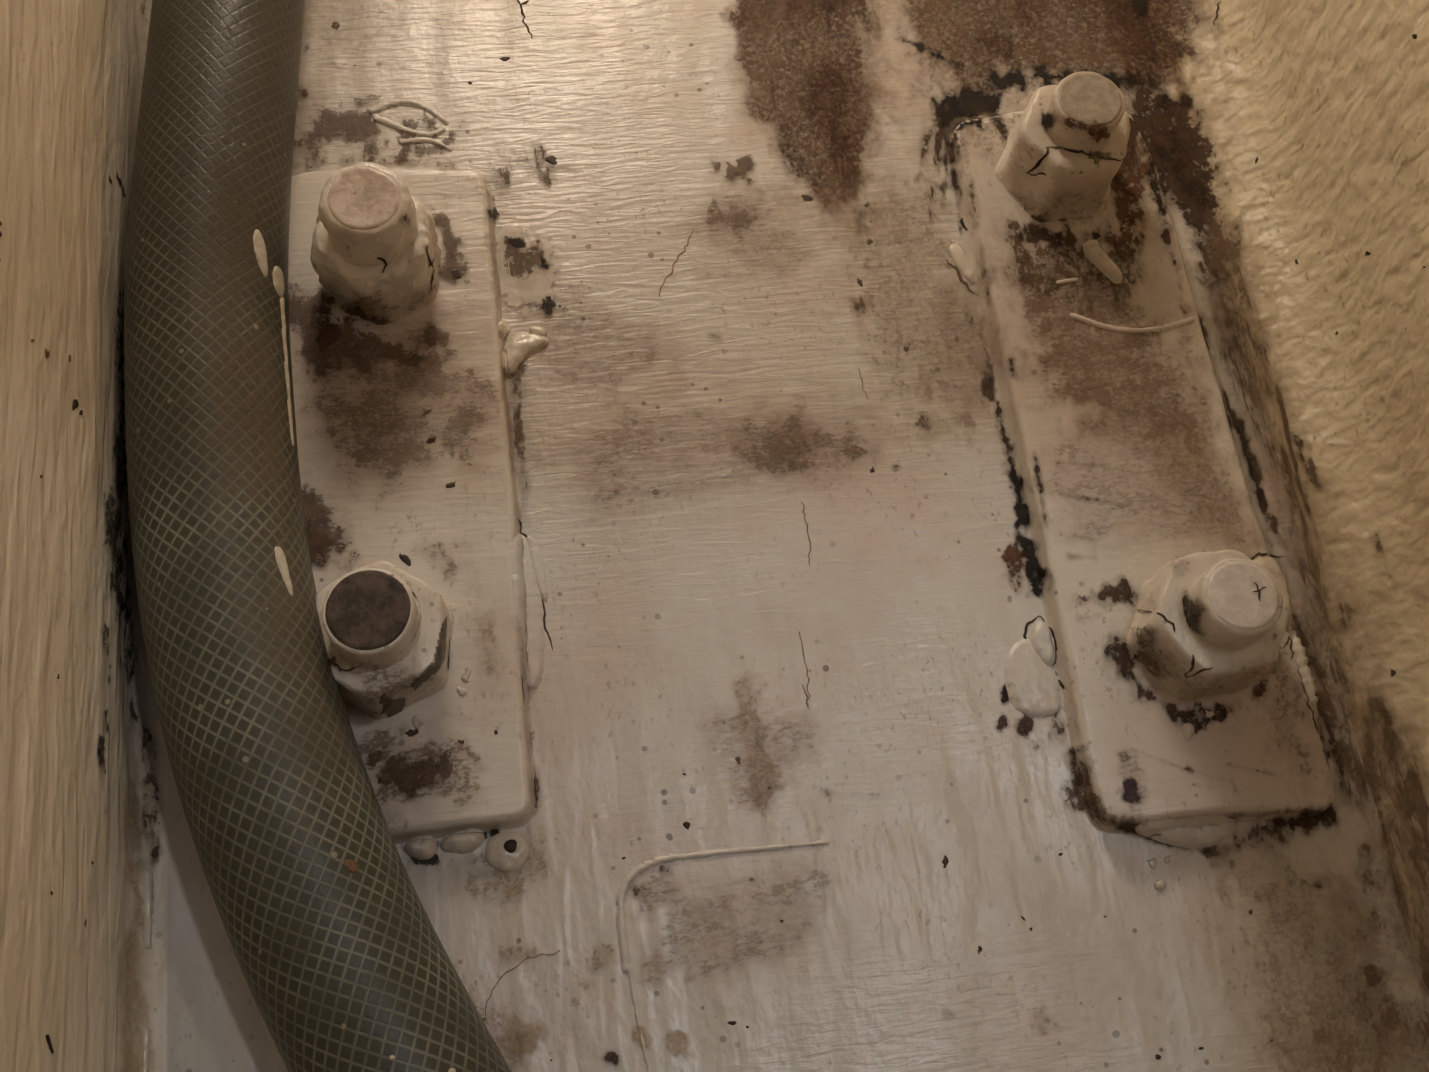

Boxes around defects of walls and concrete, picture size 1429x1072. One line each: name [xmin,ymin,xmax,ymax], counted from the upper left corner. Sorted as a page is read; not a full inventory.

corrosion [851,278,866,310]
corrosion [903,0,1429,994]
corrosion [1337,964,1429,1072]